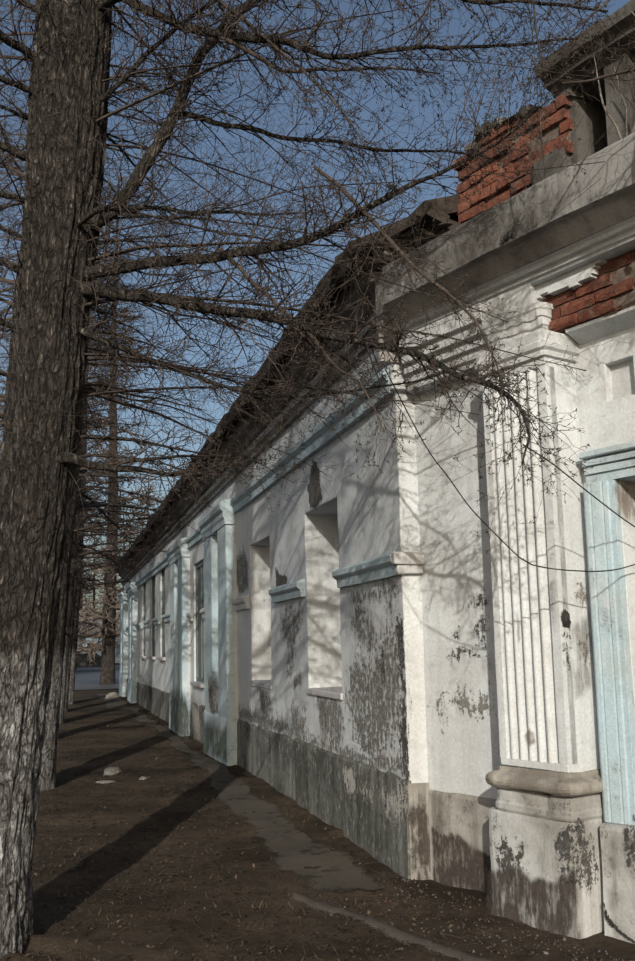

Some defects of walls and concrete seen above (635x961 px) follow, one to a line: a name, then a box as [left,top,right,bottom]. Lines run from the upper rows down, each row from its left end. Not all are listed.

flaking render [453,86,593,224]
flaking render [543,249,635,335]
flaking render [307,460,322,509]
flaking render [238,577,412,831]
peeling [427,587,497,734]
damp [409,803,599,940]